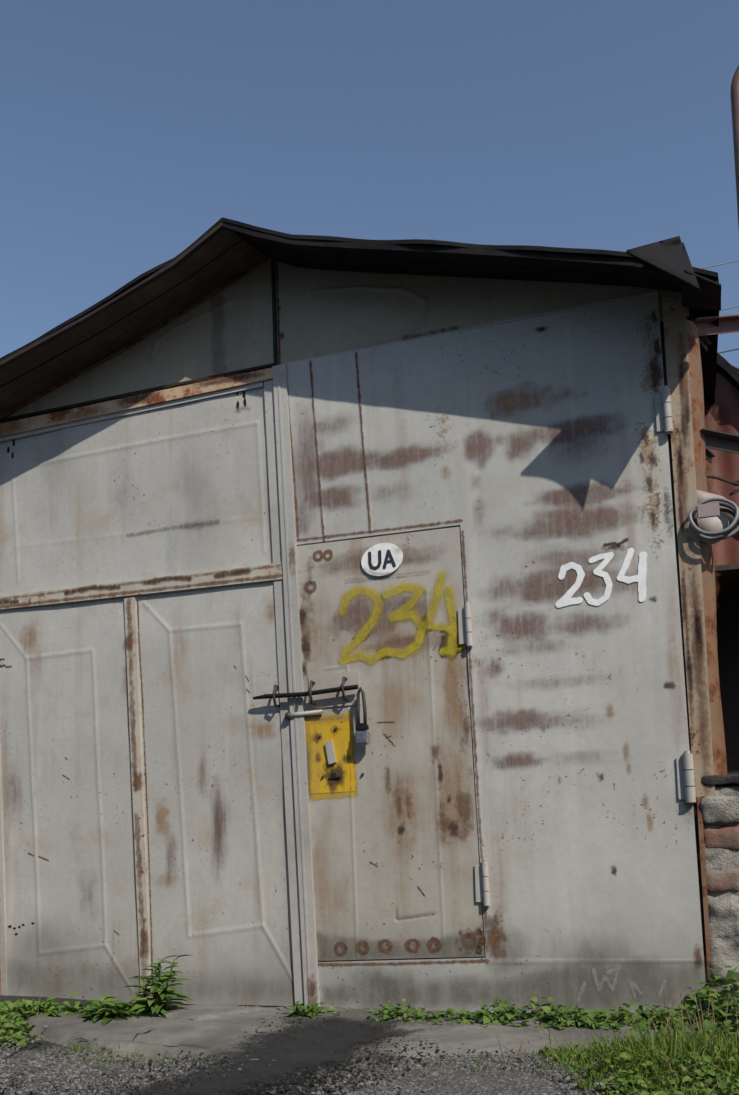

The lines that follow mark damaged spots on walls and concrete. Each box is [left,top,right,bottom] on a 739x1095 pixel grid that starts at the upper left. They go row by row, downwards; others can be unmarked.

corrosion [199,373,258,386]
corrosion [466,433,491,461]
corrosion [511,417,607,457]
corrosion [664,356,690,530]
corrosion [288,353,467,675]
corrosion [529,485,622,536]
corrosion [682,570,707,758]
corrosion [497,711,544,729]
corrosion [0,566,281,995]
corrosion [433,648,482,857]
corrosion [502,755,536,766]
corrosion [318,906,506,966]